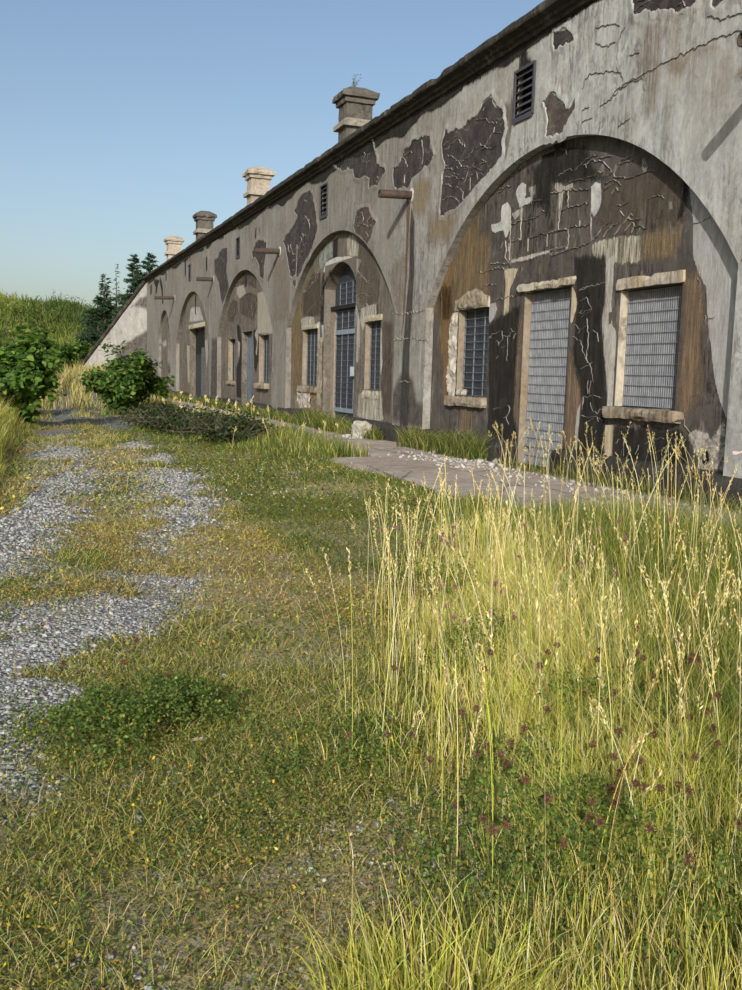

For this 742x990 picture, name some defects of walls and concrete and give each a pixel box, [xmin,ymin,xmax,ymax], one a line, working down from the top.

crack [582,0,741,122]
spalling [627,0,742,26]
spalling [540,83,580,145]
spalling [214,236,267,322]
spalling [283,187,319,292]
spalling [332,88,509,249]
crack [402,106,664,300]
crack [489,329,516,360]